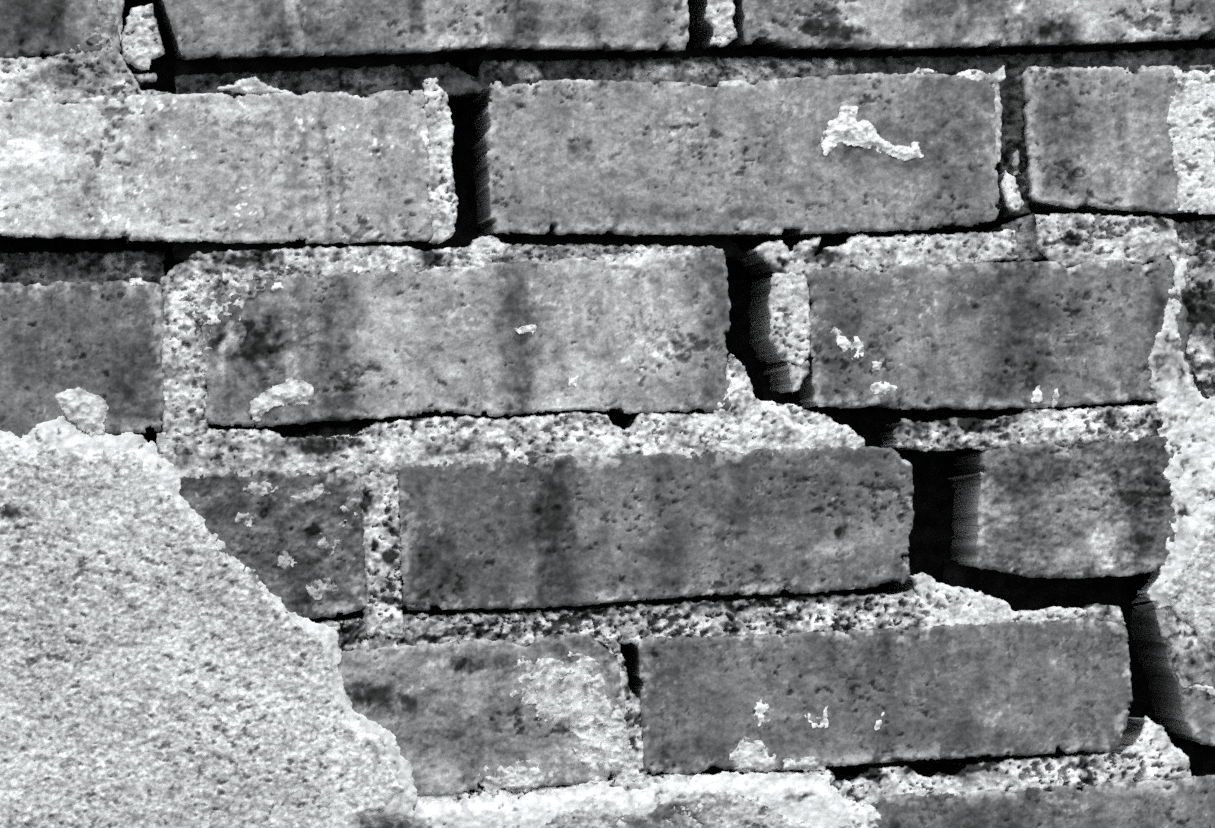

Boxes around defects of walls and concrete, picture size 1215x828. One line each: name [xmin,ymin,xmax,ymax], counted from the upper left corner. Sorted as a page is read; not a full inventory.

crack [119,0,1215,90]
crack [0,97,906,448]
crack [961,217,1009,233]
spalling [1178,250,1215,399]
flaking render [0,416,881,828]
crack [875,582,890,590]
crack [892,448,1215,776]
flaking render [1131,498,1215,696]
crack [366,820,403,828]